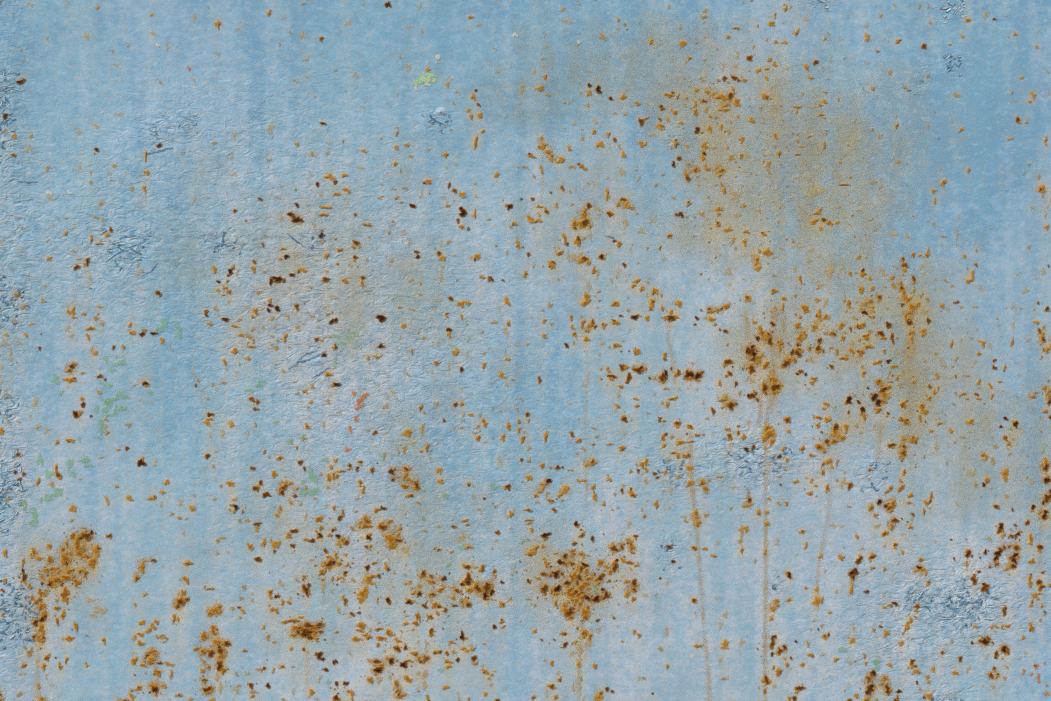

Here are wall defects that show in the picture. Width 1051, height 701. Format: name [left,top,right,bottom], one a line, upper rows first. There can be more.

rust [65,305,104,355]
rust [111,322,164,350]
rust [146,479,195,519]
rust [0,497,112,701]